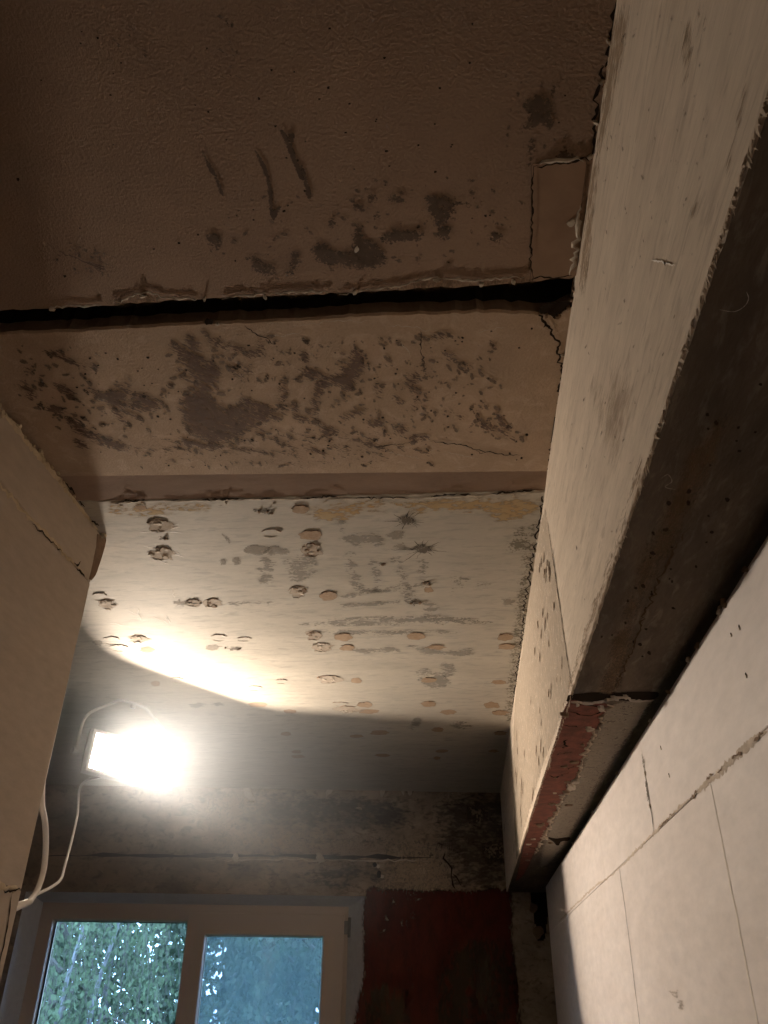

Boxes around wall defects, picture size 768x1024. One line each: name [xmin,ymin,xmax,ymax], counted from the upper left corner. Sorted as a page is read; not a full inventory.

damp [251,130,311,223]
crack [529,3,616,284]
damp [306,179,511,270]
damp [17,331,524,470]
crack [538,314,564,470]
spalling [110,499,176,561]
spalling [93,592,118,610]
spalling [93,634,155,654]
spalling [174,598,222,608]
spalling [515,695,652,881]
crack [642,732,763,827]
crack [41,852,461,889]